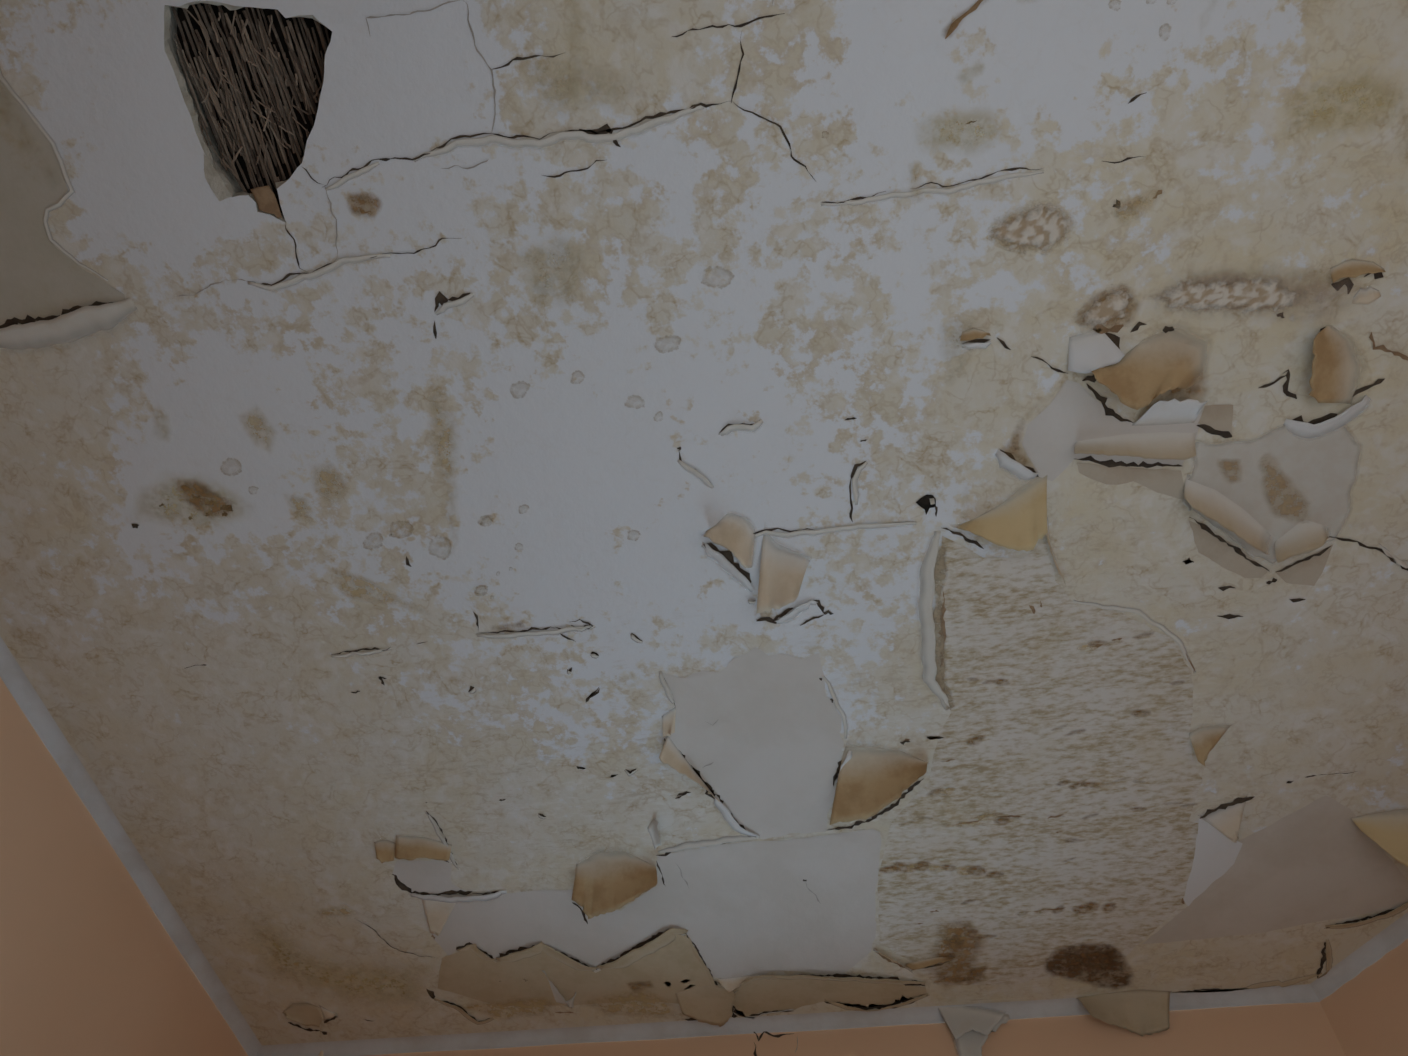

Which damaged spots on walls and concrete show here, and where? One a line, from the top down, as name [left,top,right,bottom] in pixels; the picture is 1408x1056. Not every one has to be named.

peeling [0,71,137,348]
spalling [164,1,332,223]
crack [179,0,1044,296]
peeling [960,328,1011,350]
peeling [1022,332,1208,481]
peeling [392,518,1203,1027]
leakage [880,862,1003,877]
leakage [937,925,988,983]
leakage [1021,903,1114,913]
leakage [1046,945,1131,988]
peeling [1076,902,1408,1036]